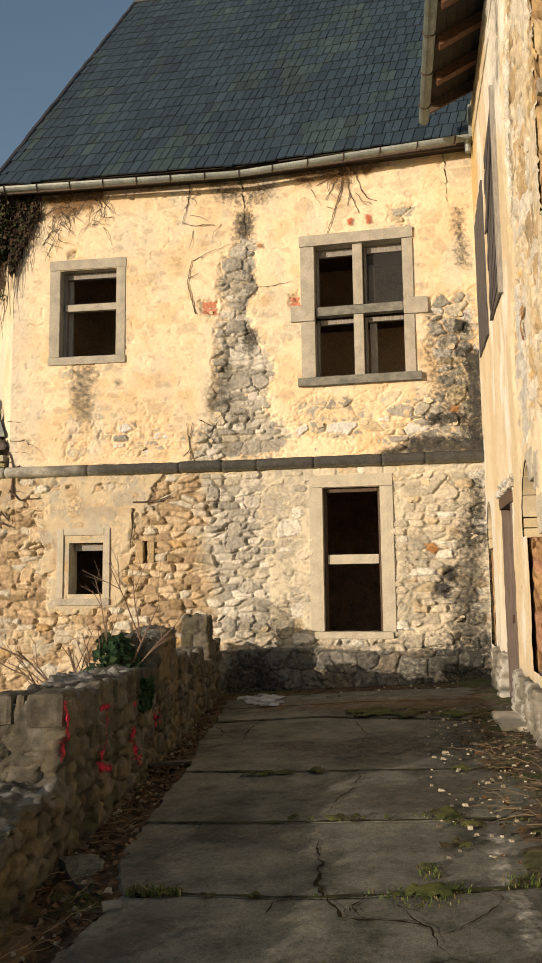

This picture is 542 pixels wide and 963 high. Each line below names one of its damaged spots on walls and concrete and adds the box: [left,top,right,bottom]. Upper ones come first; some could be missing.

leakage [72,368,95,419]
spalling [193,236,480,460]
spalling [187,465,496,659]
crack [265,841,504,963]